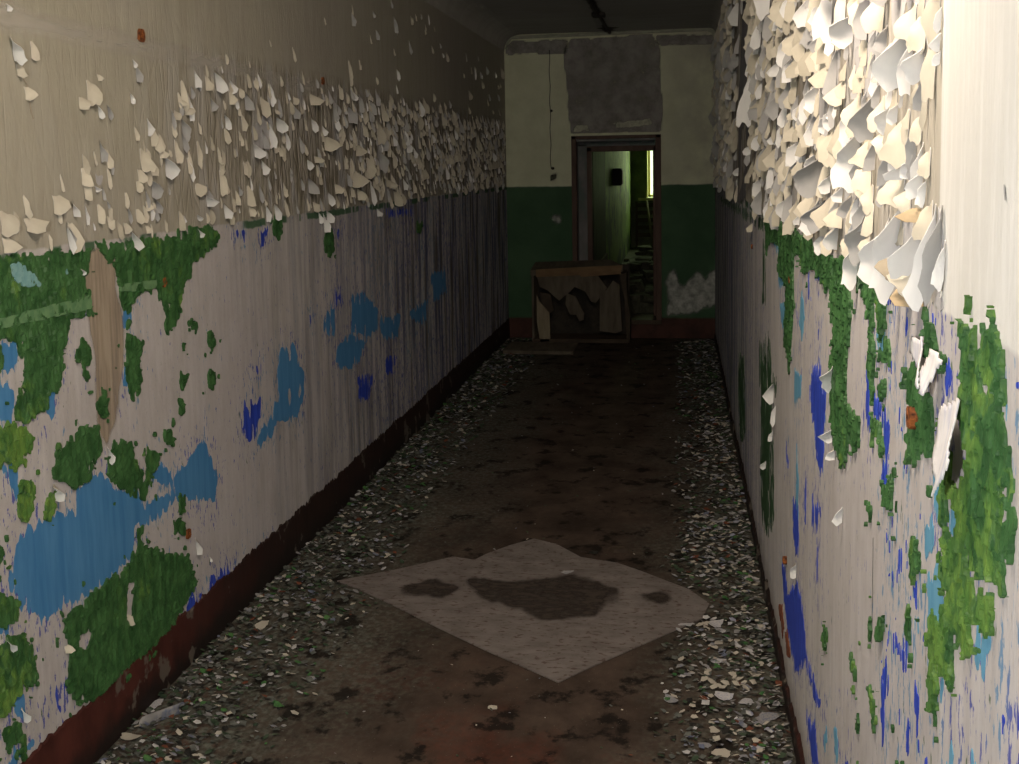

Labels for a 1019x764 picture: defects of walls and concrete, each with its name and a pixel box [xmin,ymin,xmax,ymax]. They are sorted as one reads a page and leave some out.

peeling [10,37,40,101]
peeling [506,0,1019,764]